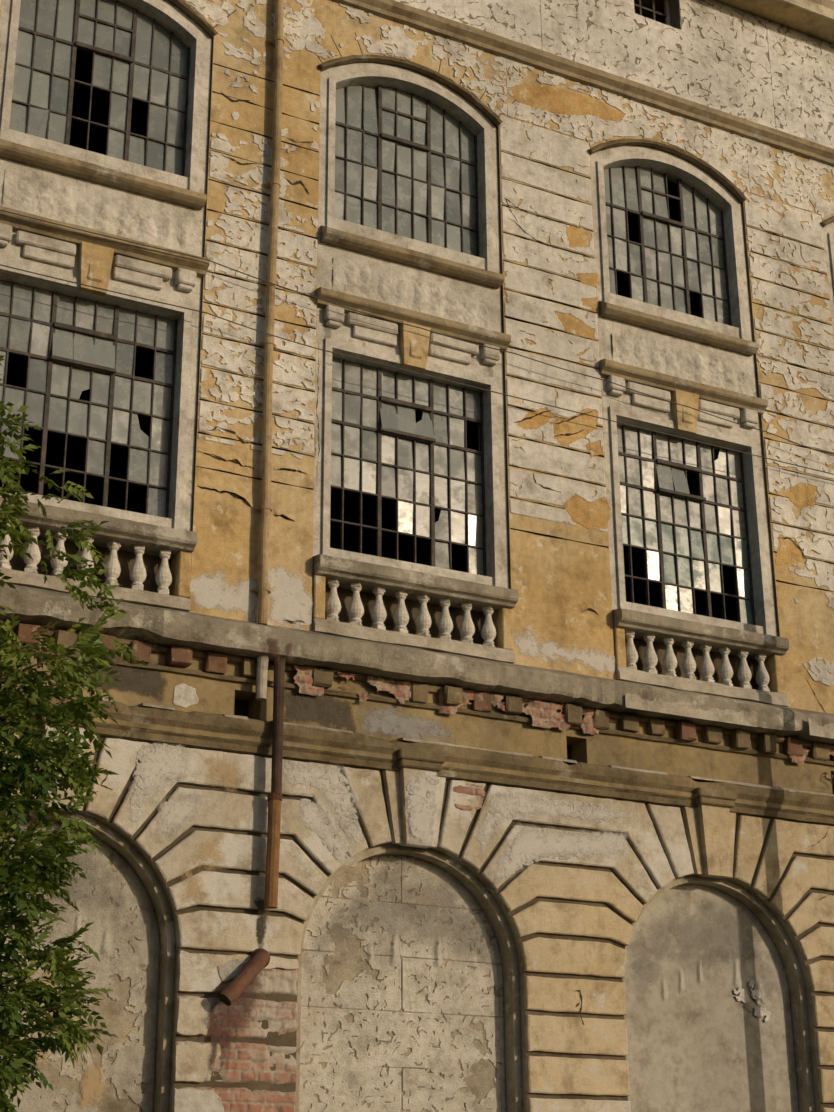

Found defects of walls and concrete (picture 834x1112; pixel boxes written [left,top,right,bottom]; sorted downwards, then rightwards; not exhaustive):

peeling [184,0,834,608]
flaking render [290,665,411,704]
flaking render [438,688,505,715]
flaking render [522,699,599,735]
spalling [625,693,758,727]
peeling [803,657,834,686]
spalling [789,718,834,764]
peeling [127,743,202,837]
peeling [453,783,629,878]
peeling [170,760,506,1112]
peeling [0,820,160,1112]
peeling [733,980,771,1022]